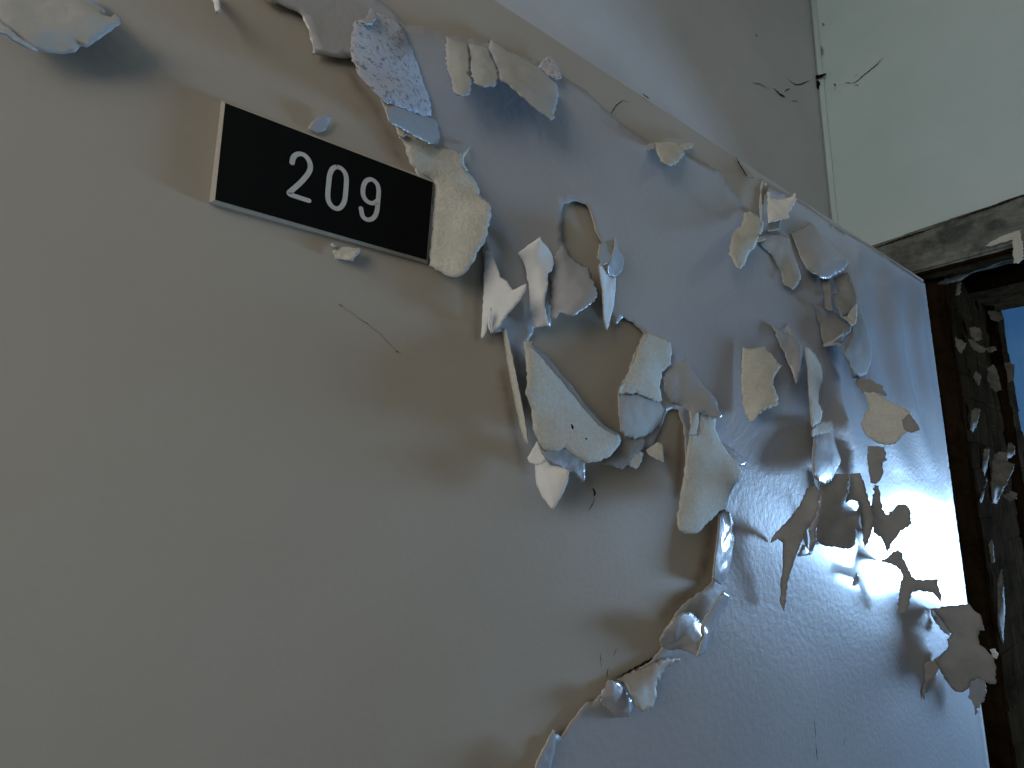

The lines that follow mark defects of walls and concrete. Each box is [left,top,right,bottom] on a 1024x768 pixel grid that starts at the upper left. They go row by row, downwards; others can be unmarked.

peeling [0,0,121,54]
peeling [266,0,1005,768]
peeling [955,326,1015,392]
peeling [979,442,1018,504]